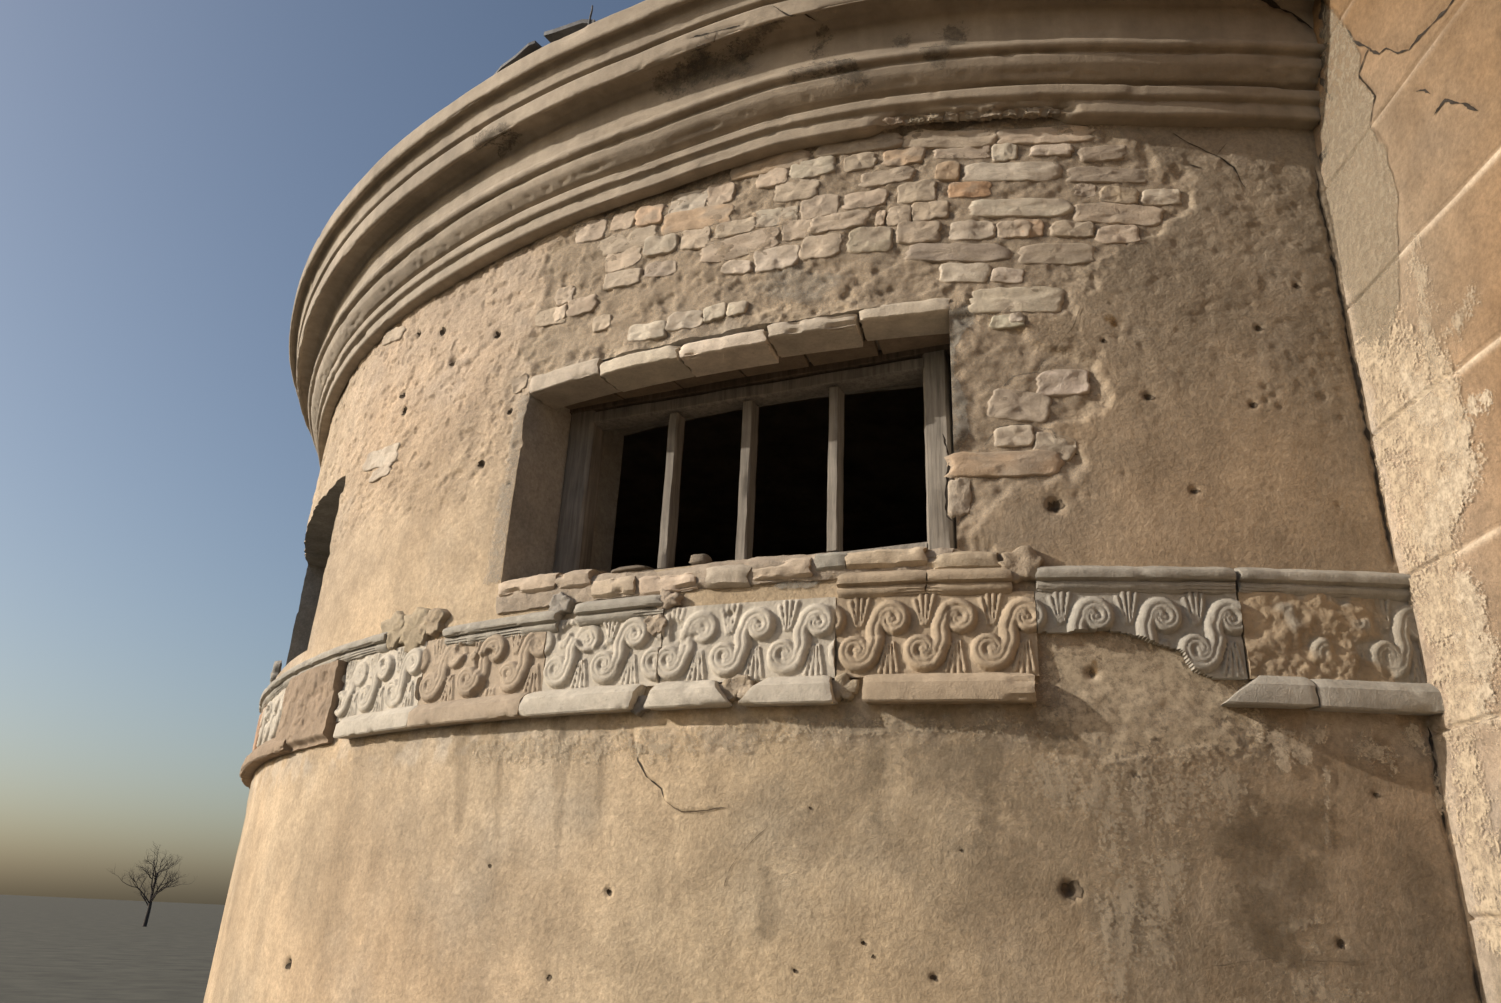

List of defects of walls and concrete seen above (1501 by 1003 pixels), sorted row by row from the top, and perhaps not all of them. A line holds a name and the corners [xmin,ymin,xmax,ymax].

spalling [507,107,1187,551]
crack [1262,0,1453,559]
crack [1418,89,1478,115]
crack [636,748,726,812]
leakage [1247,714,1332,845]
leakage [1351,234,1501,955]